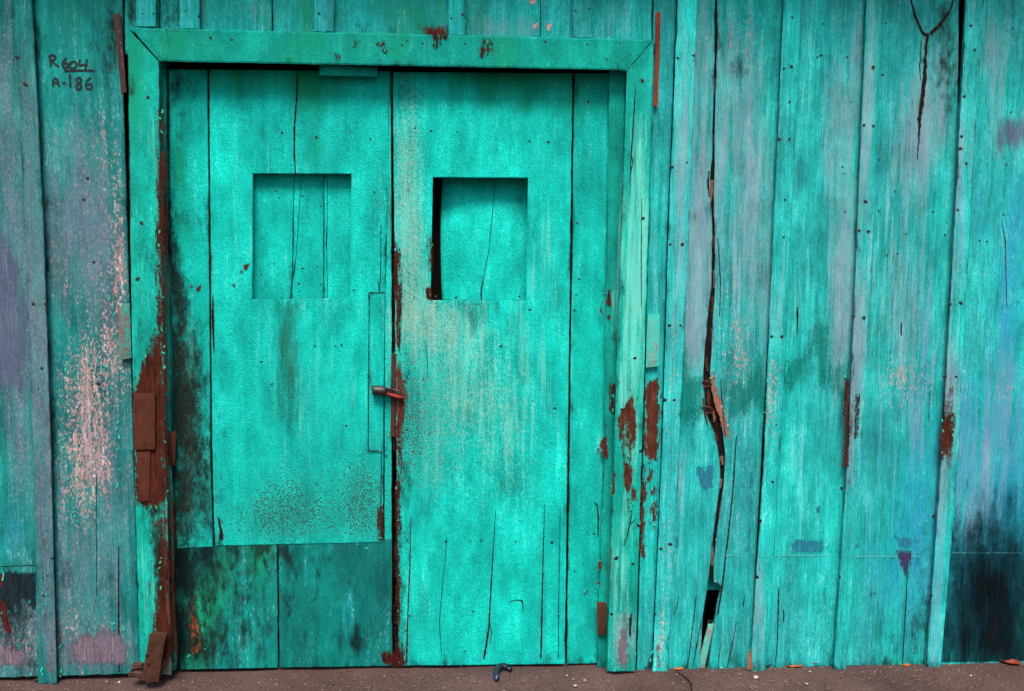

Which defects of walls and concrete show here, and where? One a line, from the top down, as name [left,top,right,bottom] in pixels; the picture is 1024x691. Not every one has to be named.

rust [423,26,448,49]
crack [910,0,954,160]
crack [675,0,745,666]
peeling [64,365,104,484]
rust [395,364,408,465]
leakage [943,504,1024,662]
rust [385,650,408,667]